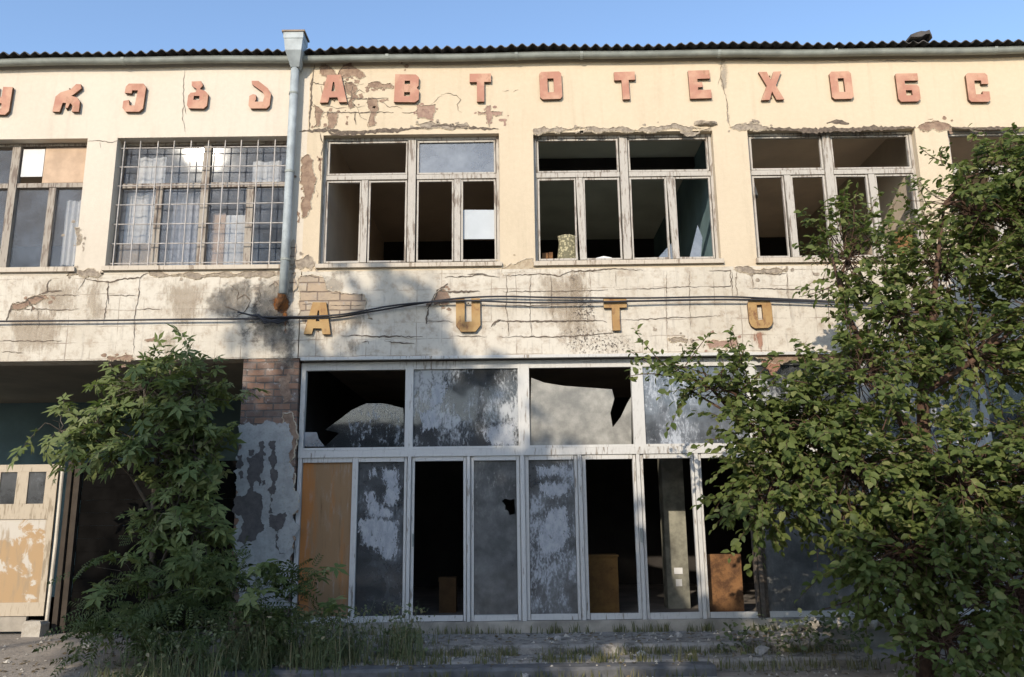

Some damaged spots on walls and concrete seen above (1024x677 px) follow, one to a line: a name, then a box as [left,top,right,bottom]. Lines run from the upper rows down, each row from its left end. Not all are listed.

flaking render [311,63,394,133]
flaking render [410,103,509,131]
flaking render [532,122,712,137]
flaking render [728,119,775,132]
flaking render [916,116,953,134]
peeling [294,154,323,223]
crack [3,273,151,353]
flaking render [148,239,373,324]
corrosion [273,297,289,331]
crack [224,275,364,316]
crack [350,268,830,344]
flaking render [232,373,300,609]